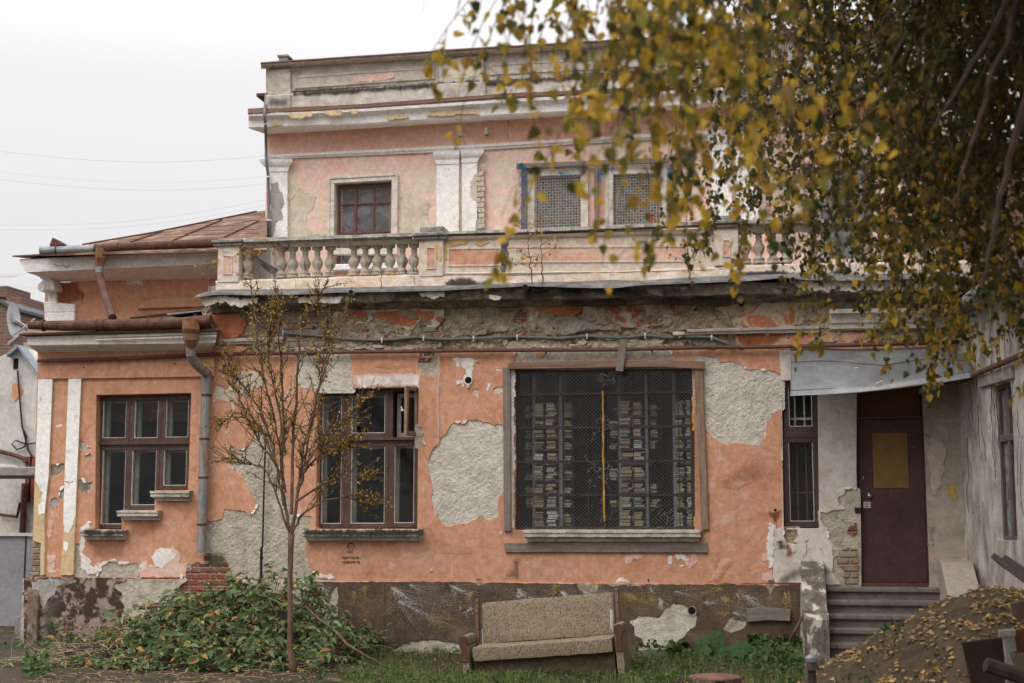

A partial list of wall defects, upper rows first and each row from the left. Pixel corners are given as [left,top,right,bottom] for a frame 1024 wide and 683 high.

peeling [270,181,327,243]
flaking render [213,371,263,433]
flaking render [264,307,785,535]
flaking render [29,428,338,634]
peeling [761,523,807,594]
flaking render [817,487,861,587]
flaking render [629,604,697,647]